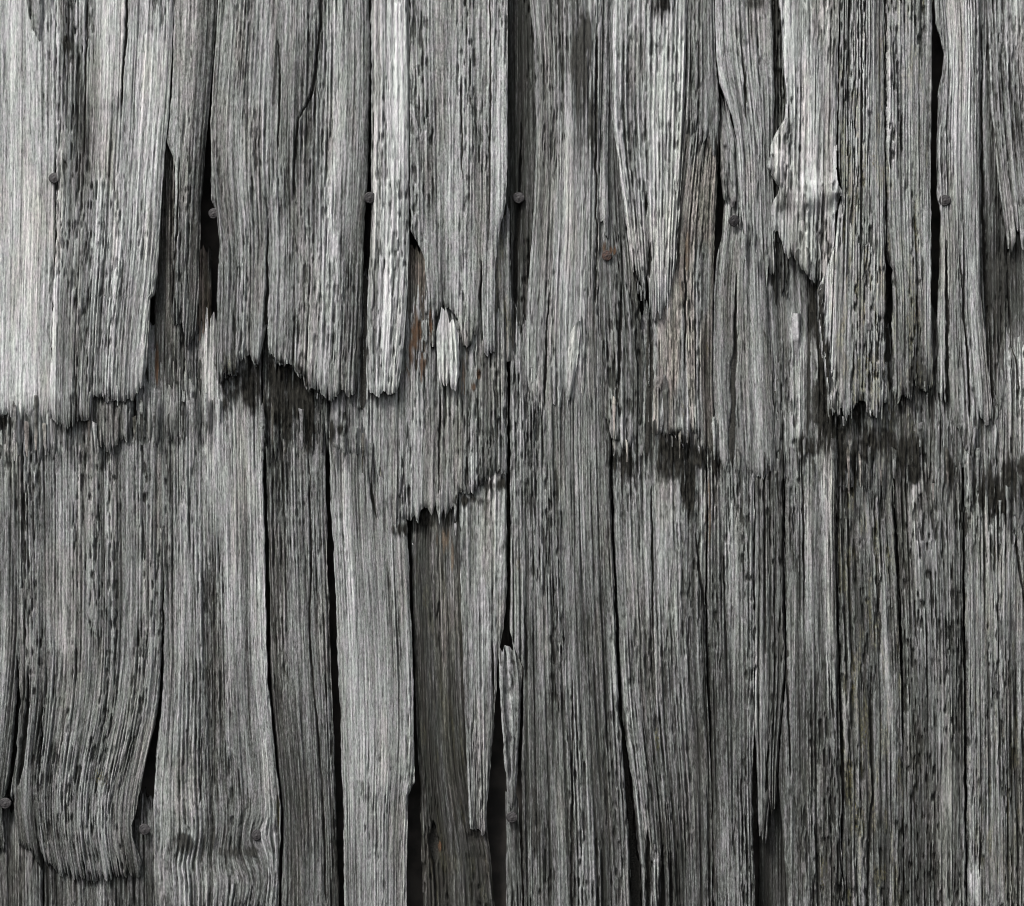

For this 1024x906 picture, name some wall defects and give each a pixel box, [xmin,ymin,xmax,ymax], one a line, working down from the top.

crack [172,159,180,308]